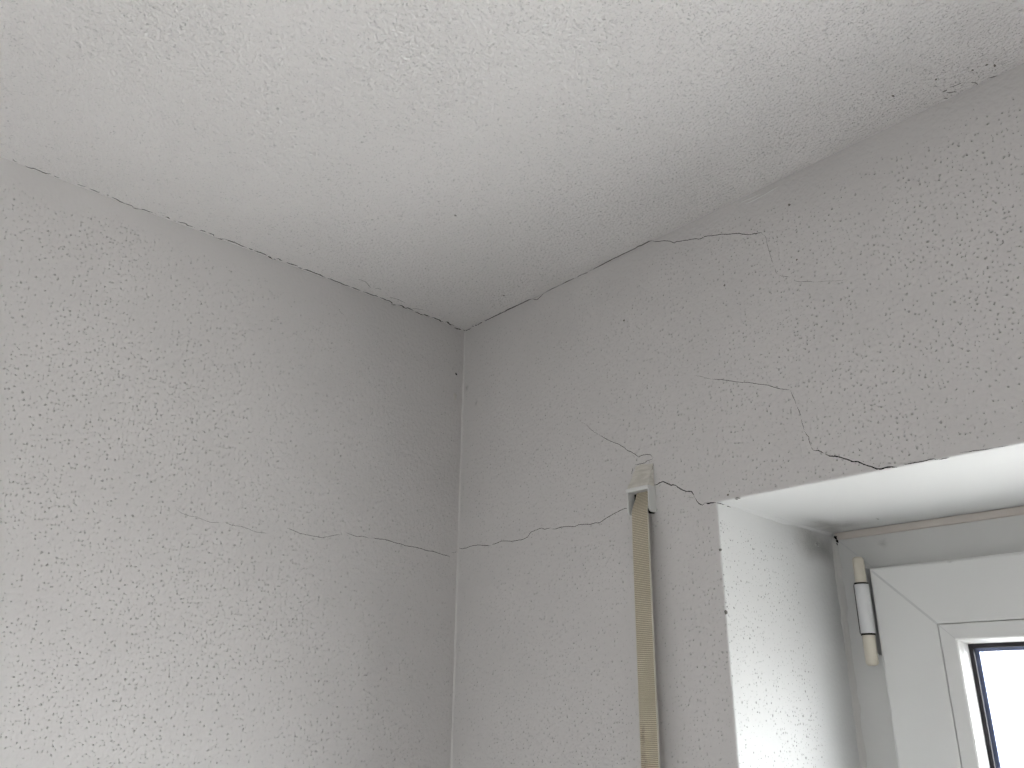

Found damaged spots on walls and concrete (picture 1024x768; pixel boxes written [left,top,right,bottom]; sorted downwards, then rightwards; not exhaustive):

crack [15,161,840,331]
crack [584,423,730,507]
crack [695,375,1008,470]